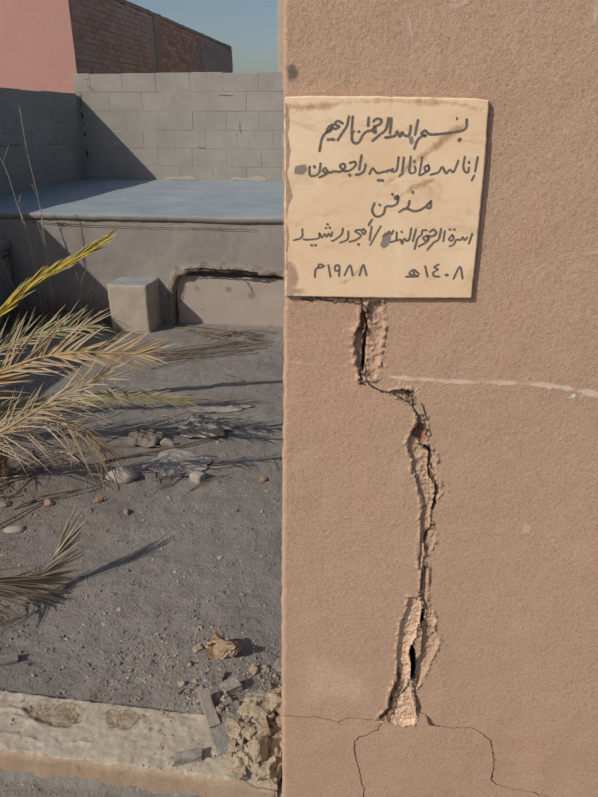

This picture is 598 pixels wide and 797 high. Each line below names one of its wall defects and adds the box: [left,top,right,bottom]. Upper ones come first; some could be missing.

crack [178,267,259,304]
crack [290,296,429,449]
crack [429,478,437,526]
flaking render [342,299,598,726]
crack [283,545,549,797]